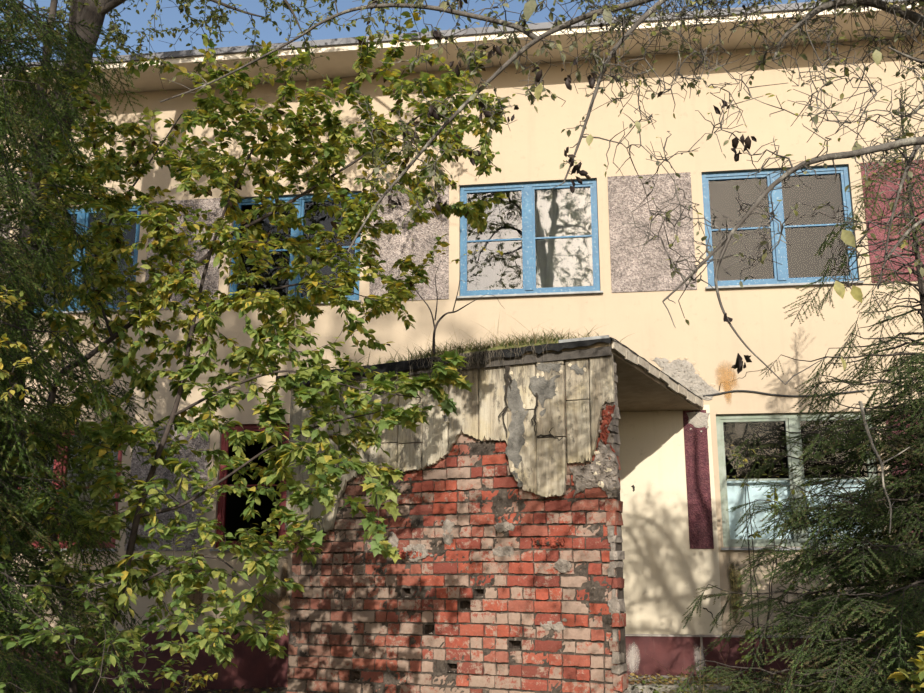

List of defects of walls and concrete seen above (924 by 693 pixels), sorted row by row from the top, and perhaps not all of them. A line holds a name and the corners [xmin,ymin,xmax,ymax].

spalling [650,356,725,400]
peeling [503,362,587,491]
spalling [687,412,710,432]
spalling [569,362,629,693]
spalling [397,545,434,560]
hole [458,588,484,611]